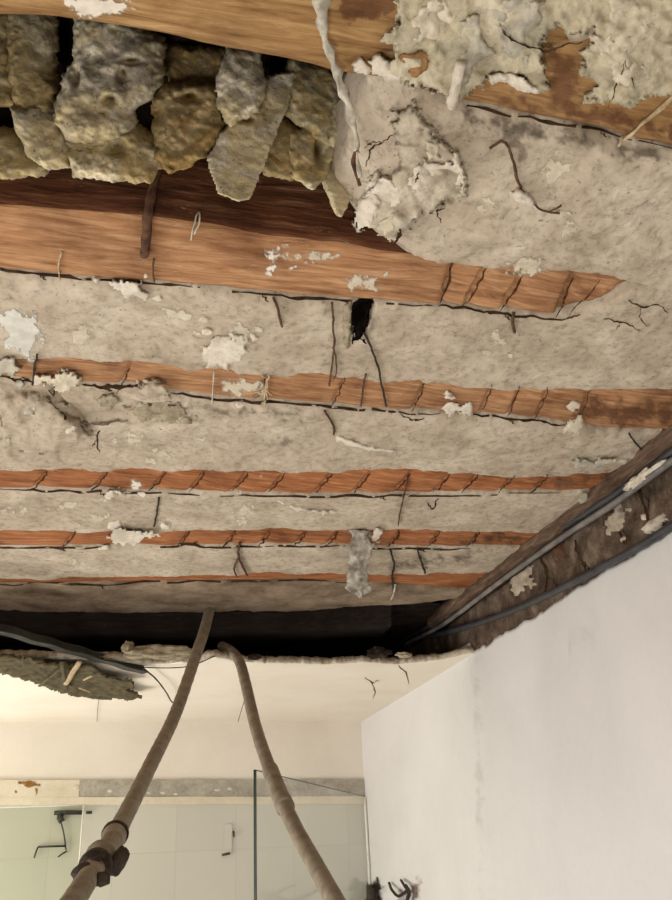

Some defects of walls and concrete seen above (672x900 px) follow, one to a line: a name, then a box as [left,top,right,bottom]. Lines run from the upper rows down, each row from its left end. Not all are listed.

flaking render [351,0,672,246]
flaking render [92,274,163,301]
hole [341,300,372,350]
crack [604,300,668,331]
flaking render [193,315,263,379]
flaking render [0,357,83,408]
flaking render [97,393,198,430]
flaking render [441,390,473,417]
flaking render [563,400,583,435]
flaking render [101,487,125,503]
flaking render [98,520,171,551]
flaking render [367,528,387,547]